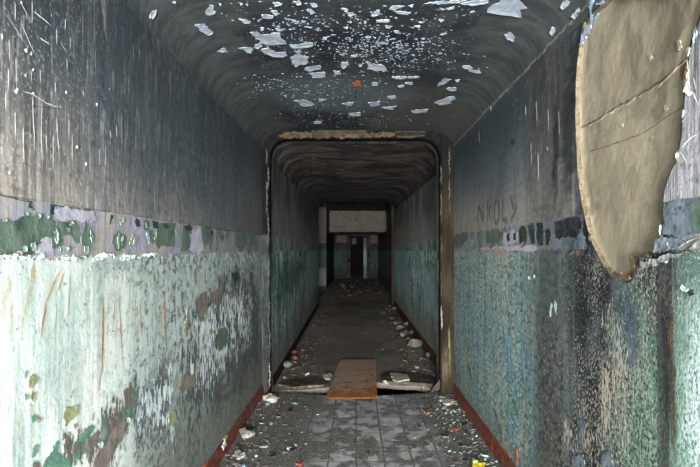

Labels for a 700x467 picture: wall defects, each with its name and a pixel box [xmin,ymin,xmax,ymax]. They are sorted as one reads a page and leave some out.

peeling [195,24,213,35]
flaking render [232,1,460,140]
peeling [428,52,488,105]
peeling [427,0,527,22]
flaking render [454,0,700,284]
peeling [0,149,307,467]
leakage [617,307,635,368]
leakage [663,313,676,431]